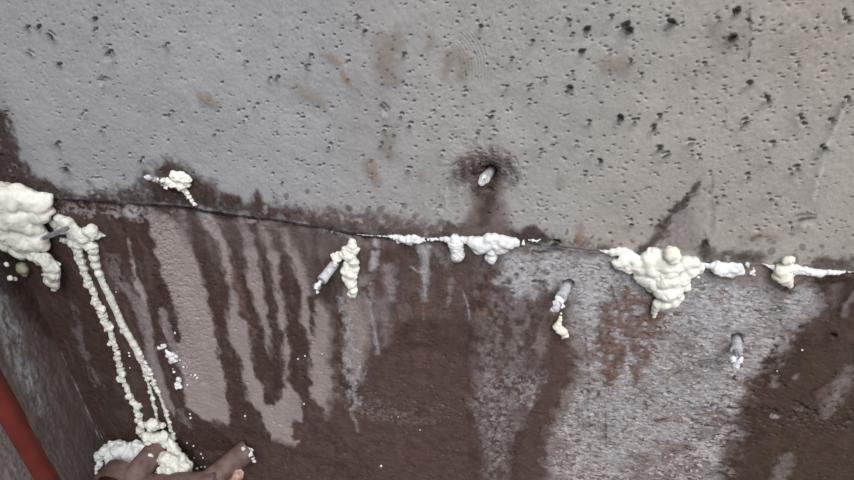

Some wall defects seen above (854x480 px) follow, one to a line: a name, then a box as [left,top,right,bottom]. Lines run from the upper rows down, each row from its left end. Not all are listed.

crack [53,199,391,240]
crack [528,246,575,254]
leakage [637,181,762,262]
leakage [0,111,633,480]
leakage [679,259,854,480]